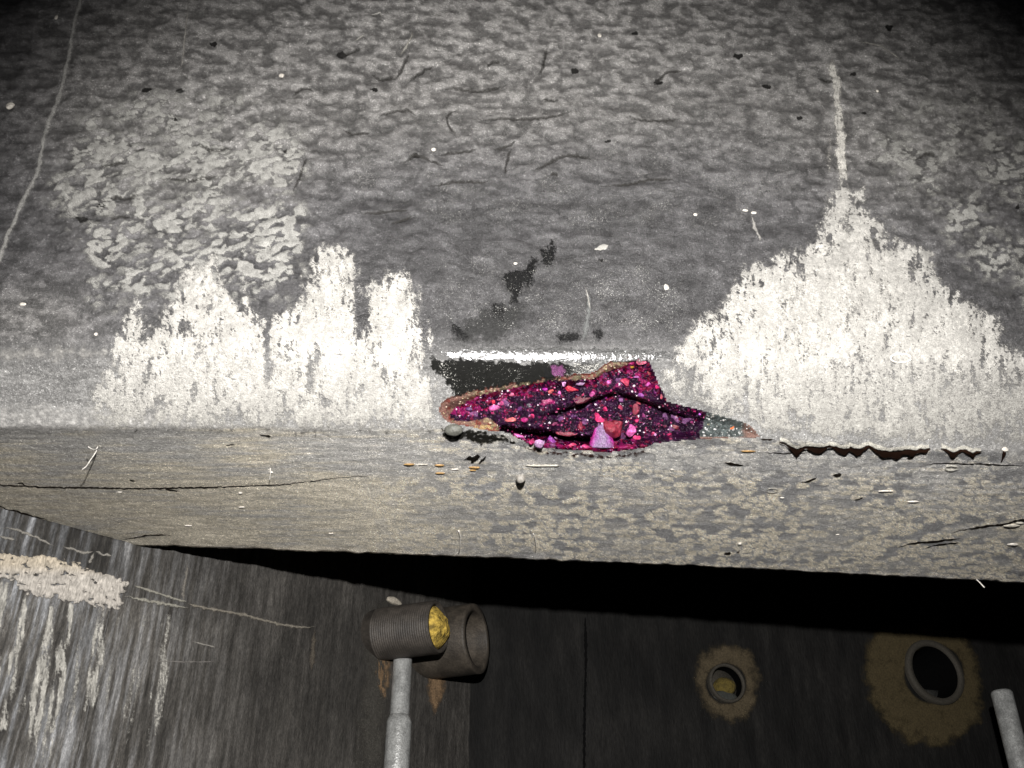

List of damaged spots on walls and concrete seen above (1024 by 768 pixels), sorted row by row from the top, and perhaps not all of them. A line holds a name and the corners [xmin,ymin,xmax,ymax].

water stain [0,63,1024,447]
spalling [439,356,760,453]
peeling [780,437,981,453]
crack [0,475,373,492]
crack [898,519,1024,548]